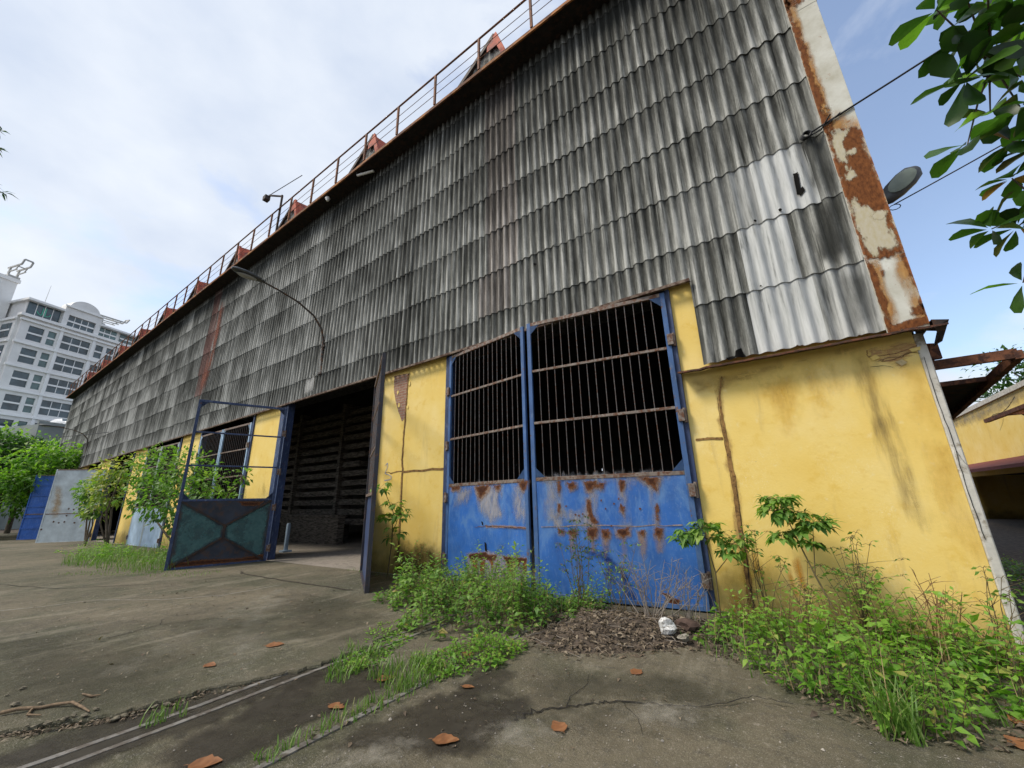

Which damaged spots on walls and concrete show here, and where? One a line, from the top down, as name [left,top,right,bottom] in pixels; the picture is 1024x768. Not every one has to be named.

peeling [831,129,857,180]
peeling [850,197,898,257]
corrosion [475,485,501,500]
corrosion [638,476,660,491]
corrosion [541,480,683,557]